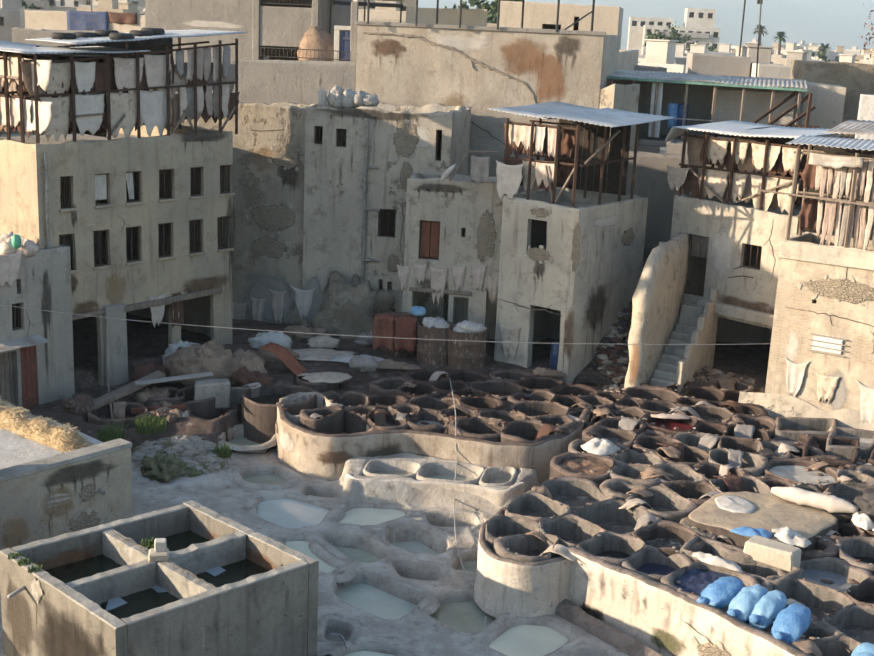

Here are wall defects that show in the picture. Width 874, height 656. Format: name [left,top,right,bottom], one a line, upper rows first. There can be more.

damp [375,40,406,61]
crack [364,32,536,104]
damp [555,37,579,65]
flaking render [267,142,300,171]
flaking render [391,119,422,193]
flaking render [474,207,499,265]
flaking render [797,273,874,306]
damp [46,460,113,507]
flaking render [63,483,104,532]